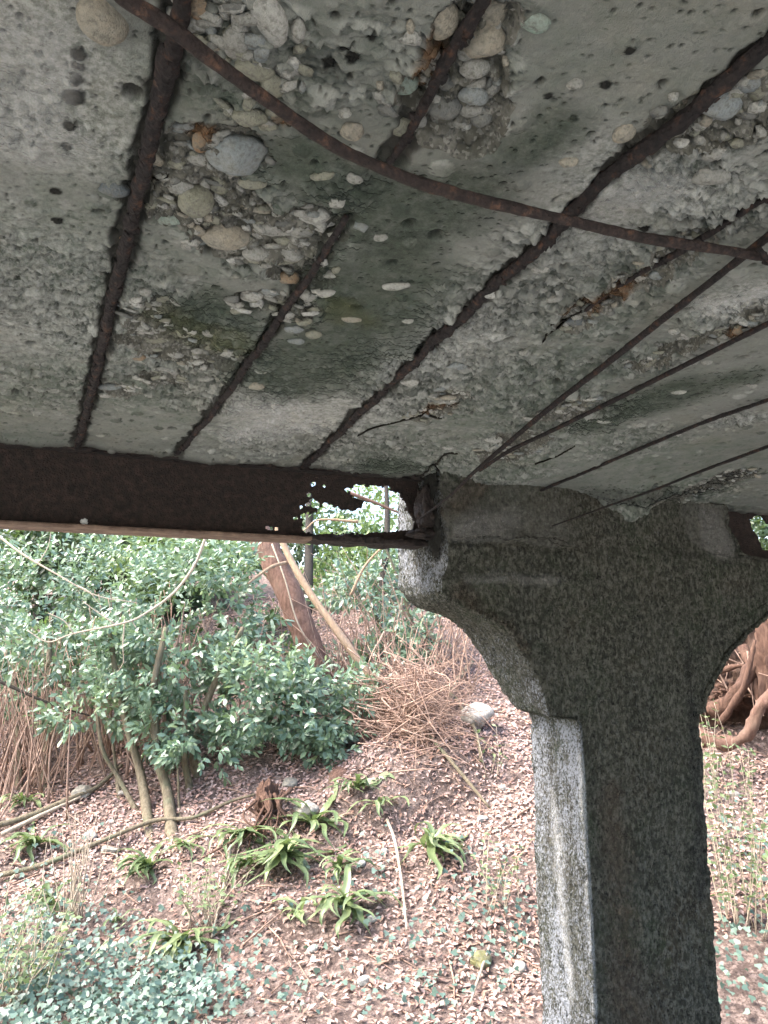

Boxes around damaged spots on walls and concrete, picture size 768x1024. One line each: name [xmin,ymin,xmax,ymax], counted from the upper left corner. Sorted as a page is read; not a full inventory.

spalling [73,0,768,527]
crack [542,310,585,343]
rust [348,483,415,521]